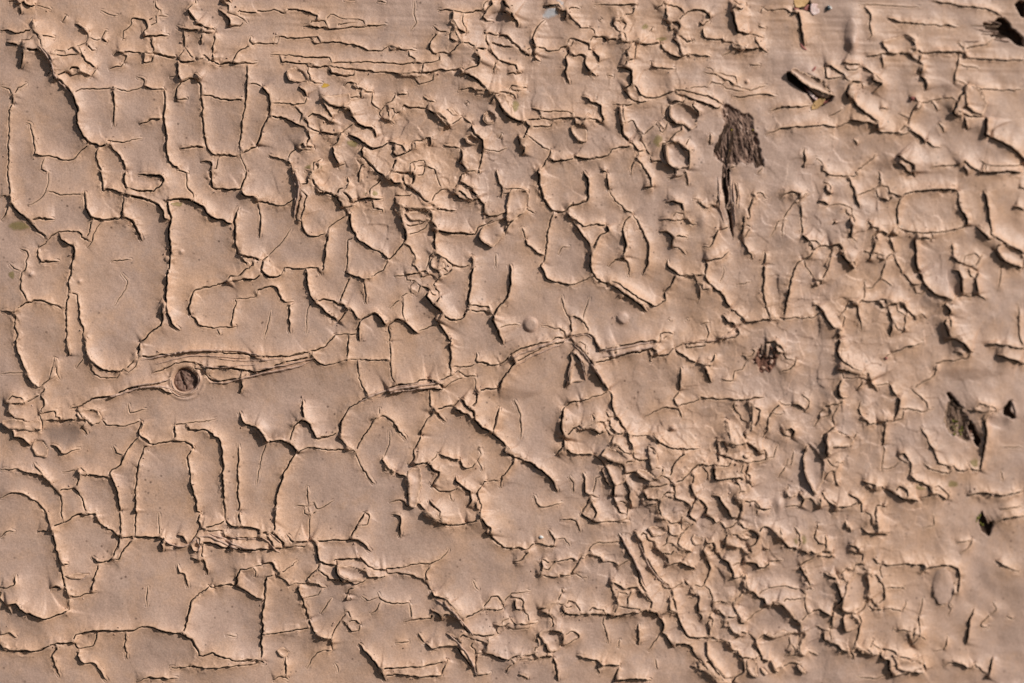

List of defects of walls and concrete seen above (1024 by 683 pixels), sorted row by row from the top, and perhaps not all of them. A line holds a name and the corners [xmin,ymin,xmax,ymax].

crack [0,0,811,340]
peeling [606,32,765,178]
peeling [790,68,881,130]
crack [822,0,1024,178]
spalling [1014,1,1024,18]
crack [0,218,492,683]
crack [308,206,606,538]
crack [471,388,687,682]
crack [607,148,990,683]
crack [930,233,1023,302]
spalling [943,392,1016,474]
crack [983,302,1024,352]